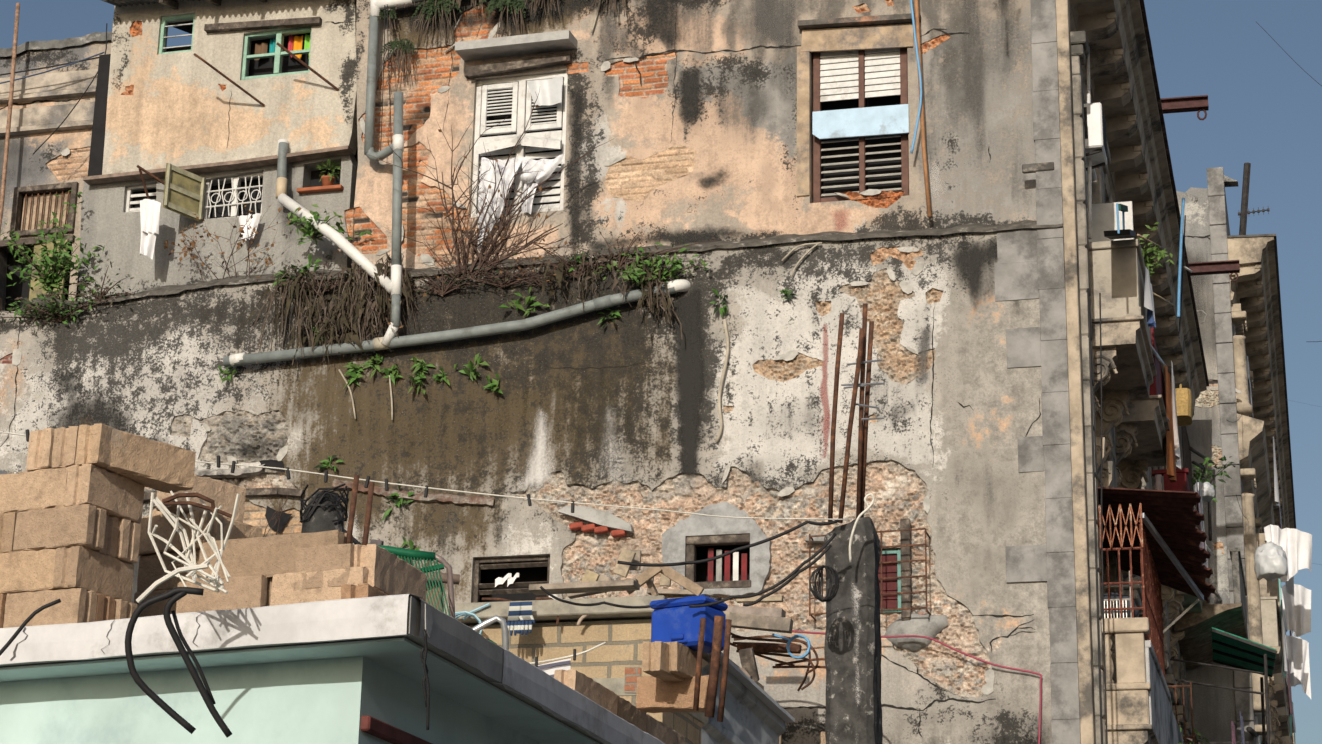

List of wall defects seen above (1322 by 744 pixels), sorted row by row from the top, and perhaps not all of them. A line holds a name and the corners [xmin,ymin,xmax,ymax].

flaking render [566,51,677,98]
flaking render [345,4,500,268]
flaking render [604,144,696,201]
damp [568,90,740,250]
flaking render [815,247,943,385]
flaking render [753,350,824,382]
damp [55,371,128,432]
damp [525,418,549,486]
flaking render [512,460,995,722]
crack [784,703,826,711]
crack [881,655,993,737]